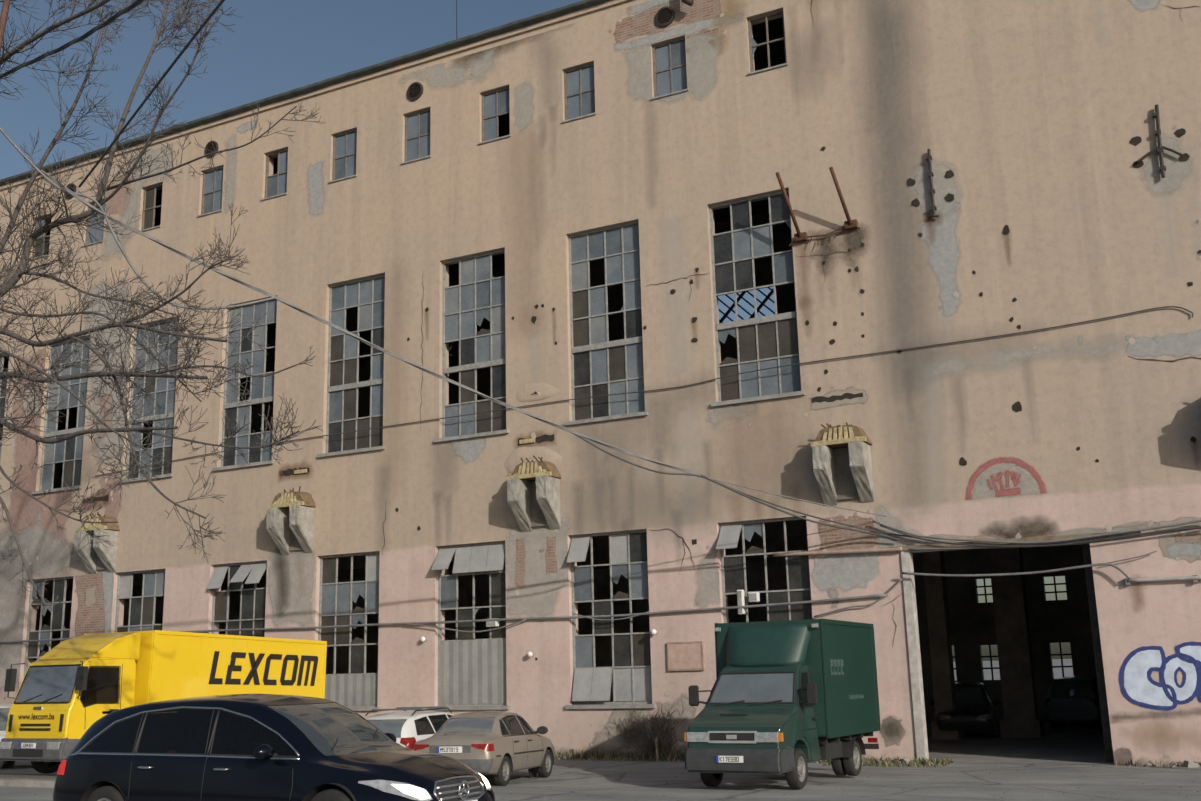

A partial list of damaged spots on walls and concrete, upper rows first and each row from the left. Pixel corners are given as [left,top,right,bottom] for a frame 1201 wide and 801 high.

spalling [609,0,727,54]
flaking render [6,351,113,553]
spalling [515,529,558,596]
crack [652,529,694,573]
water stain [989,521,1159,545]
spalling [67,568,107,637]